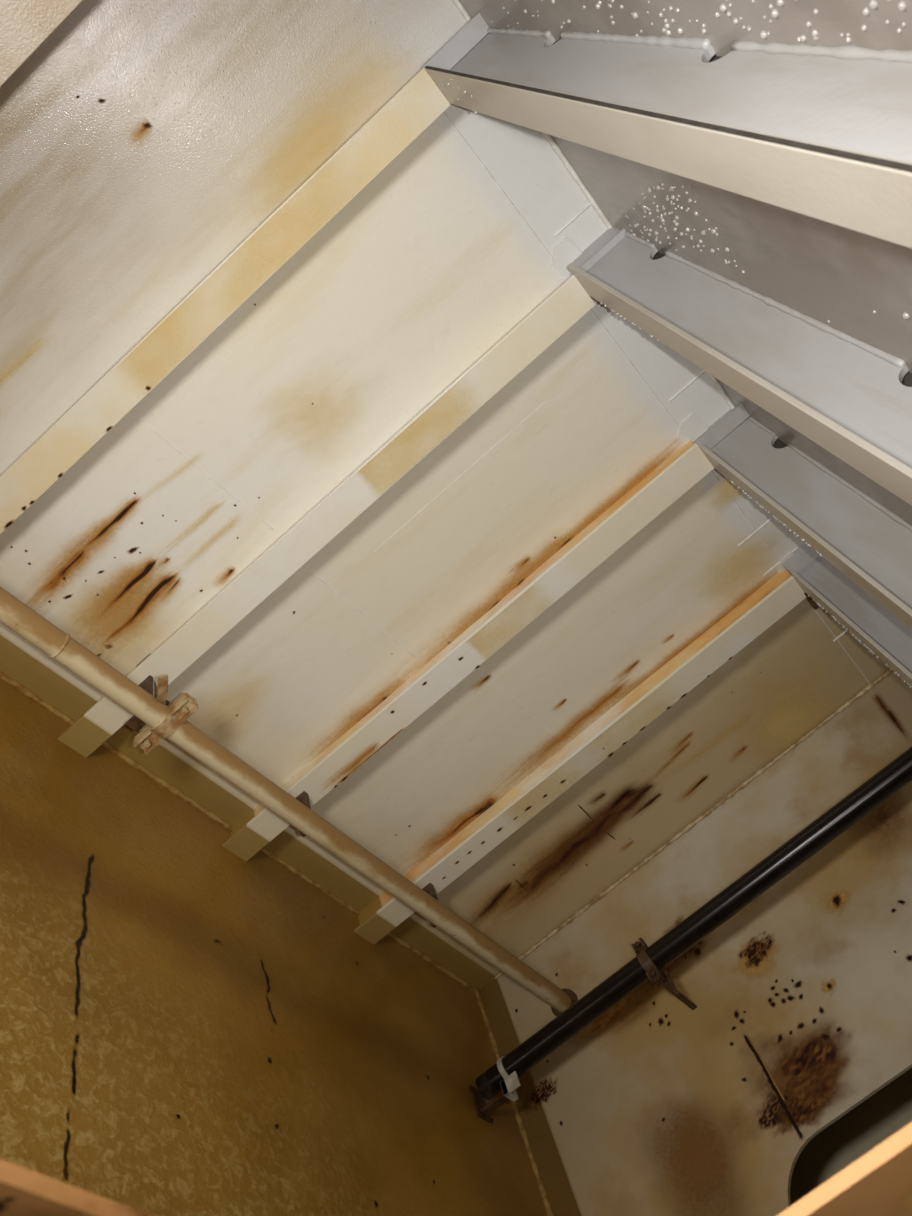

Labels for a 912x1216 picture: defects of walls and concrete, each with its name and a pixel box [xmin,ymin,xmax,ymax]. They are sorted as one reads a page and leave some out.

corrosion [30,492,139,603]
corrosion [94,548,180,657]
corrosion [424,454,670,664]
corrosion [334,729,403,788]
corrosion [340,683,403,737]
corrosion [516,575,773,779]
corrosion [424,797,496,856]
corrosion [478,720,745,918]
crack [63,855,94,1180]
crack [261,960,277,1024]
corrosion [739,936,803,1007]
corrosion [742,1007,845,1129]